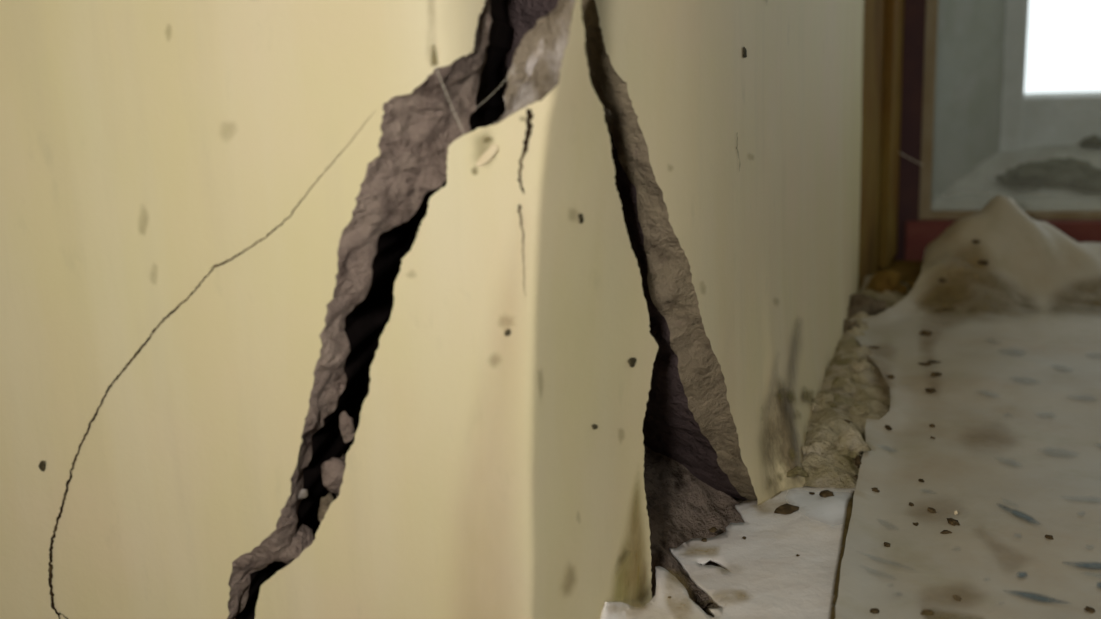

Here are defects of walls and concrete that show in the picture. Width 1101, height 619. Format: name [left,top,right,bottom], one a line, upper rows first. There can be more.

crack [48,0,757,619]